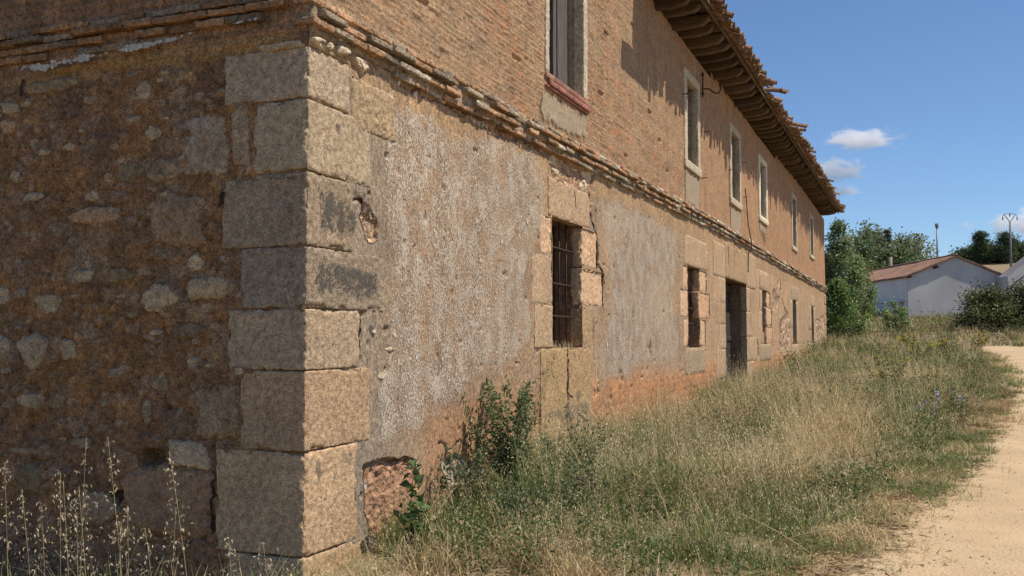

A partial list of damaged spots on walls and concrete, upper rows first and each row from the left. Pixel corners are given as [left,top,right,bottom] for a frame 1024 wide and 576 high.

peeling [359,80,679,444]
spalling [779,313,791,352]
spalling [362,456,421,540]